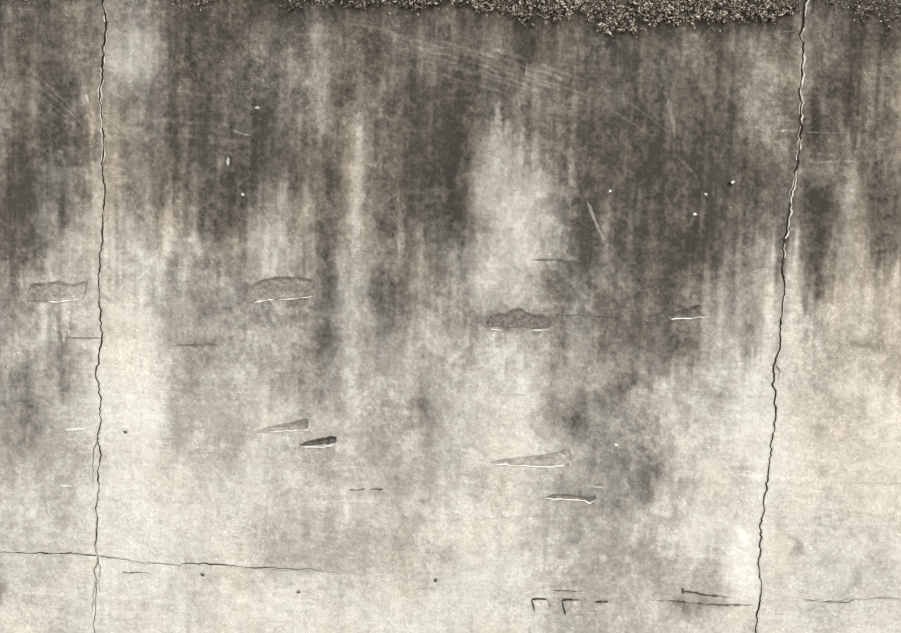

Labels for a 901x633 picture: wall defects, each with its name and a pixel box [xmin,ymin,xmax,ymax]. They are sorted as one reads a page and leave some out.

water stain [0,54,82,253]
water stain [165,99,298,231]
water stain [374,56,481,237]
water stain [563,46,736,351]
spalling [26,281,86,303]
crack [0,0,331,633]
spalling [245,277,316,303]
spalling [487,308,550,331]
crack [653,0,809,633]
spalling [257,419,336,448]
spalling [490,449,572,468]
crack [806,596,901,604]